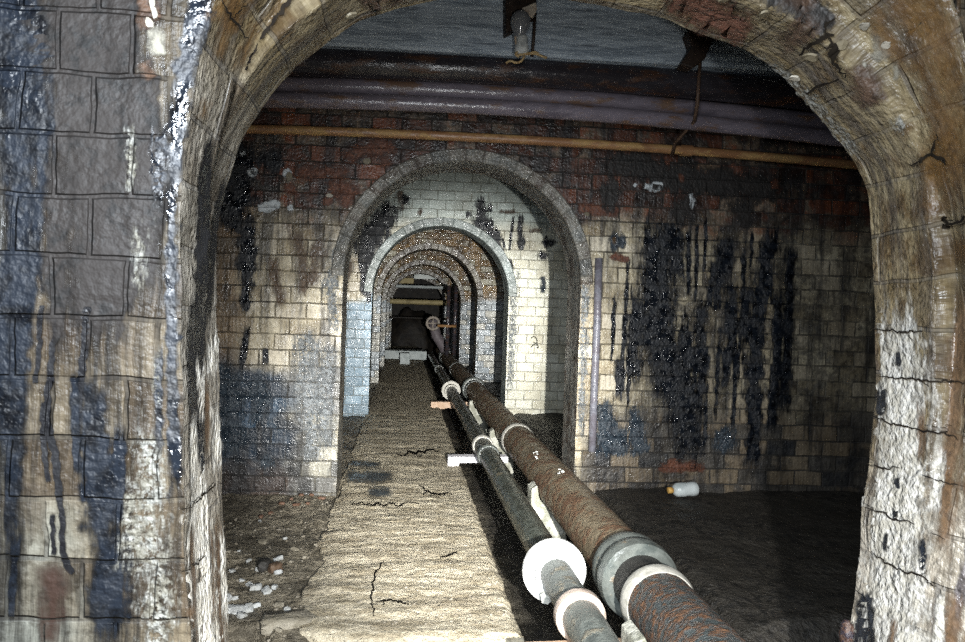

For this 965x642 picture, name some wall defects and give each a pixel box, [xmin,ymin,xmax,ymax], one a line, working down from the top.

crack [222,0,291,71]
crack [799,19,846,94]
damp [181,183,228,642]
damp [235,200,293,312]
damp [289,233,372,330]
damp [596,287,651,458]
damp [662,193,755,456]
crack [871,416,958,440]
crack [879,376,964,387]
damp [111,349,175,642]
crack [368,562,409,616]
crack [874,553,936,587]